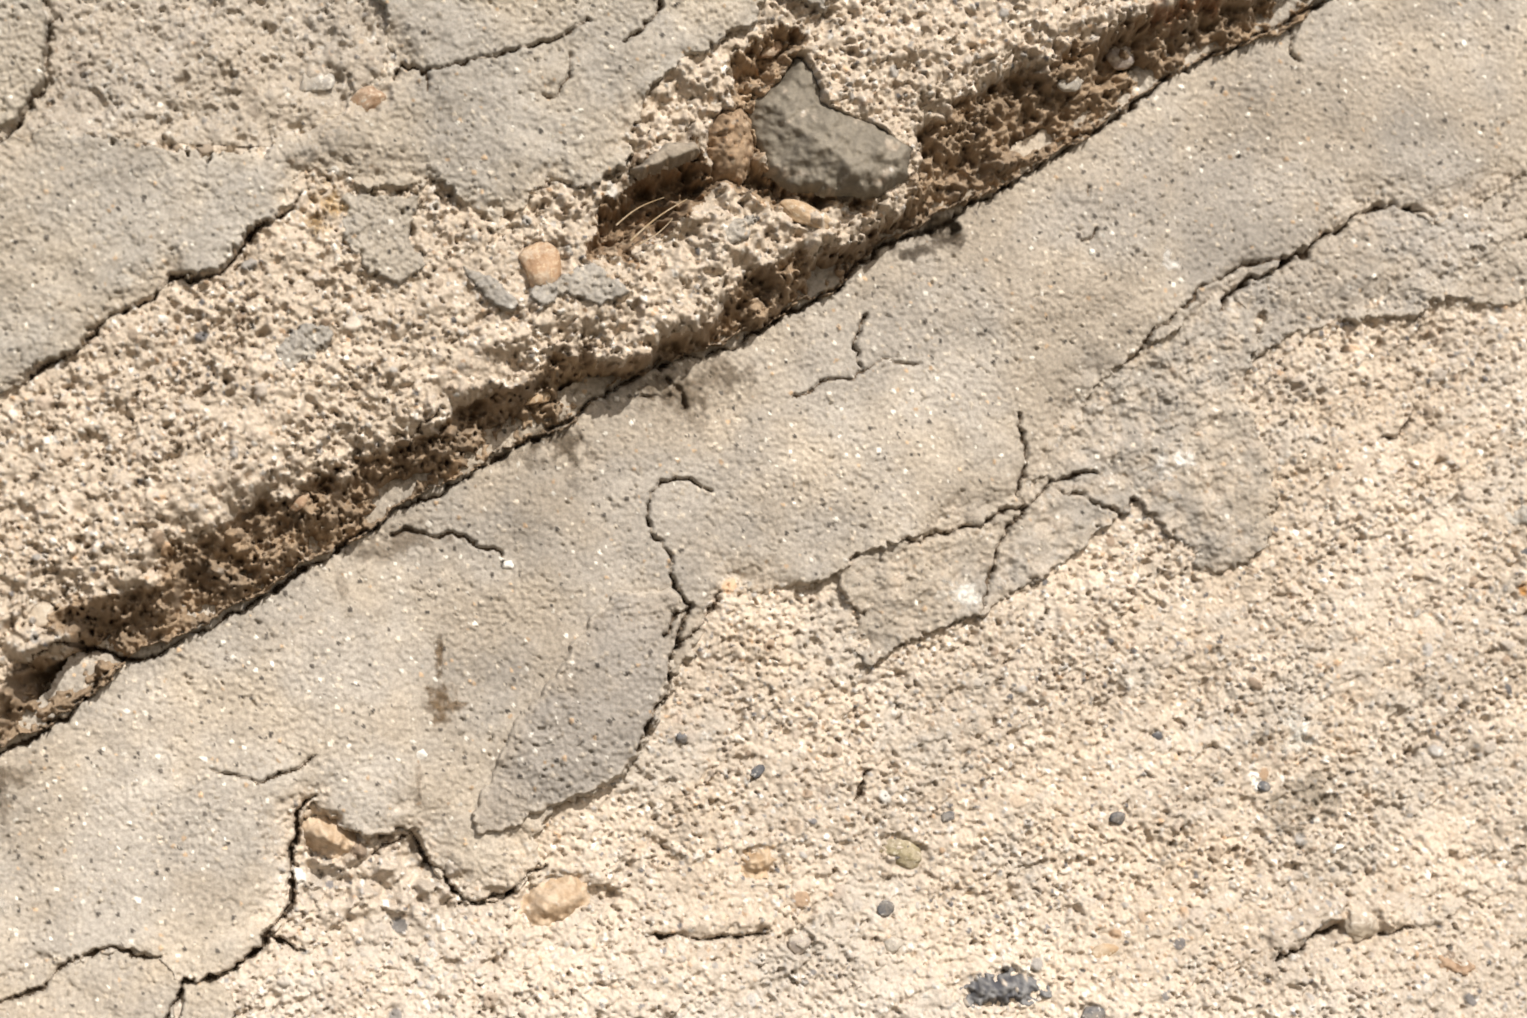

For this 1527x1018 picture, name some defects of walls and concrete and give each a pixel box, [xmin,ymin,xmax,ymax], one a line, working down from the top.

crack [0,755,316,1018]
spalling [0,0,1194,688]
crack [0,0,1328,754]
crack [854,769,869,801]
spalling [204,172,1527,1018]
crack [1126,204,1436,363]